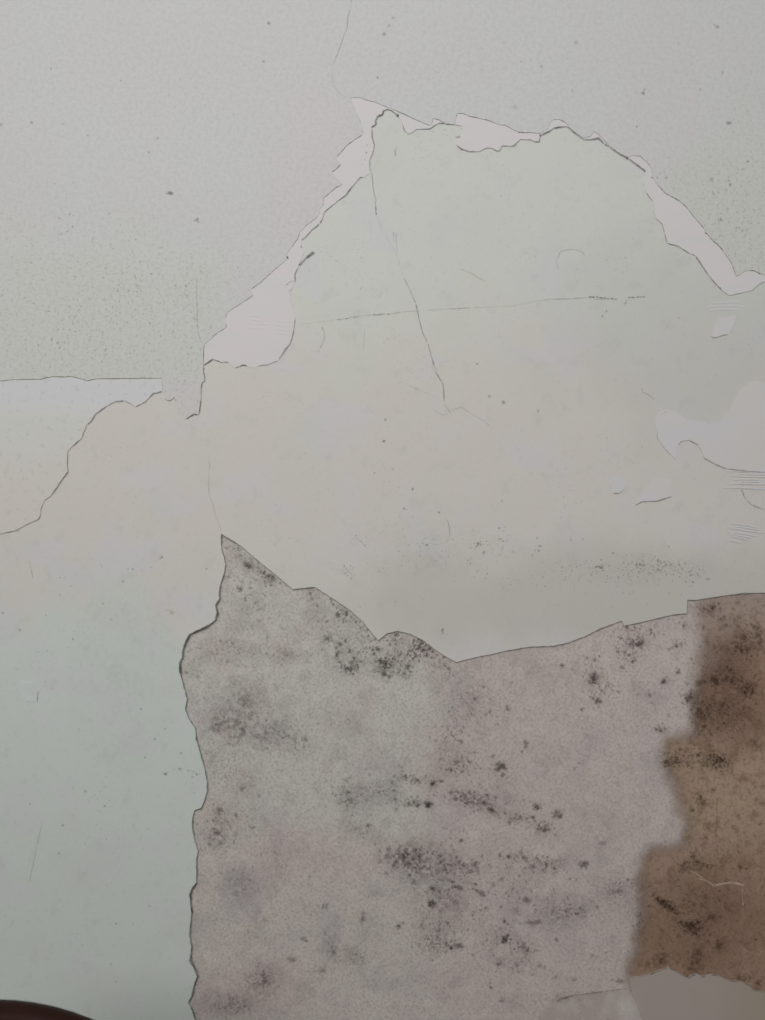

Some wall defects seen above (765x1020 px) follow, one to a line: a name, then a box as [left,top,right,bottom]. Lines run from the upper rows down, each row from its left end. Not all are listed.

peeling [203,98,399,368]
peeling [455,114,540,152]
peeling [628,156,765,296]
flaking render [179,535,765,1020]
leakage [629,595,765,992]